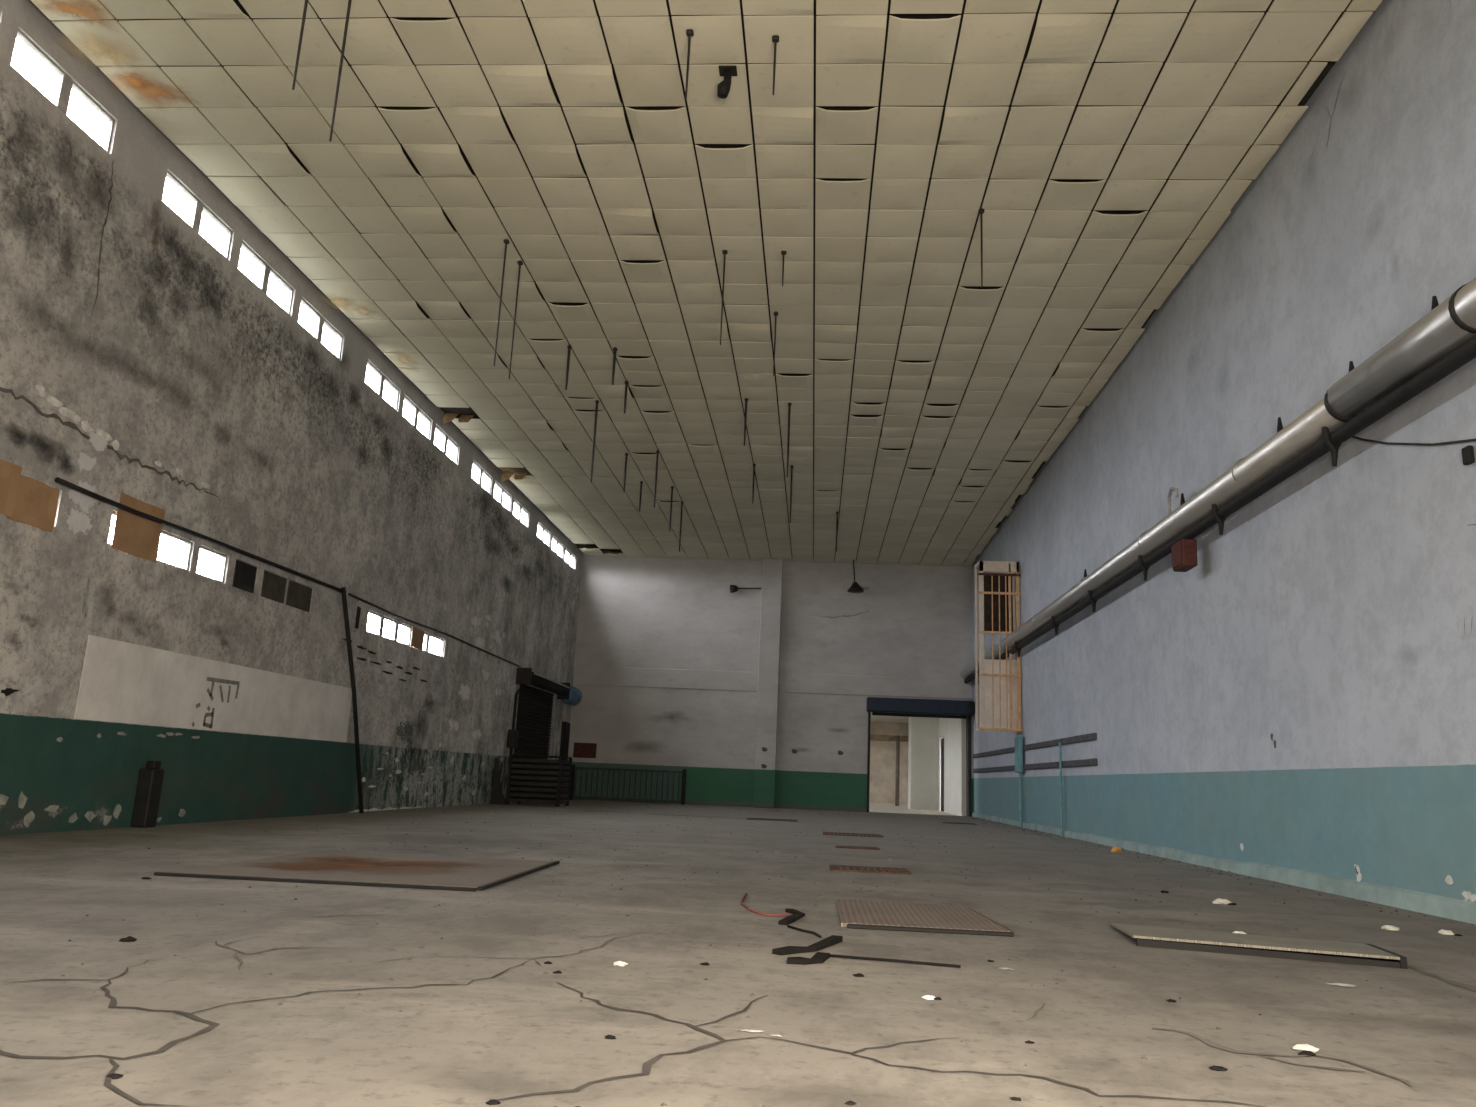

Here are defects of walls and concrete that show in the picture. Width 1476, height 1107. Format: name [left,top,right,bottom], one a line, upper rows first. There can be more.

crack [0,387,218,498]
peeling [0,791,121,830]
peeling [1445,875,1476,902]
crack [0,914,1264,1107]